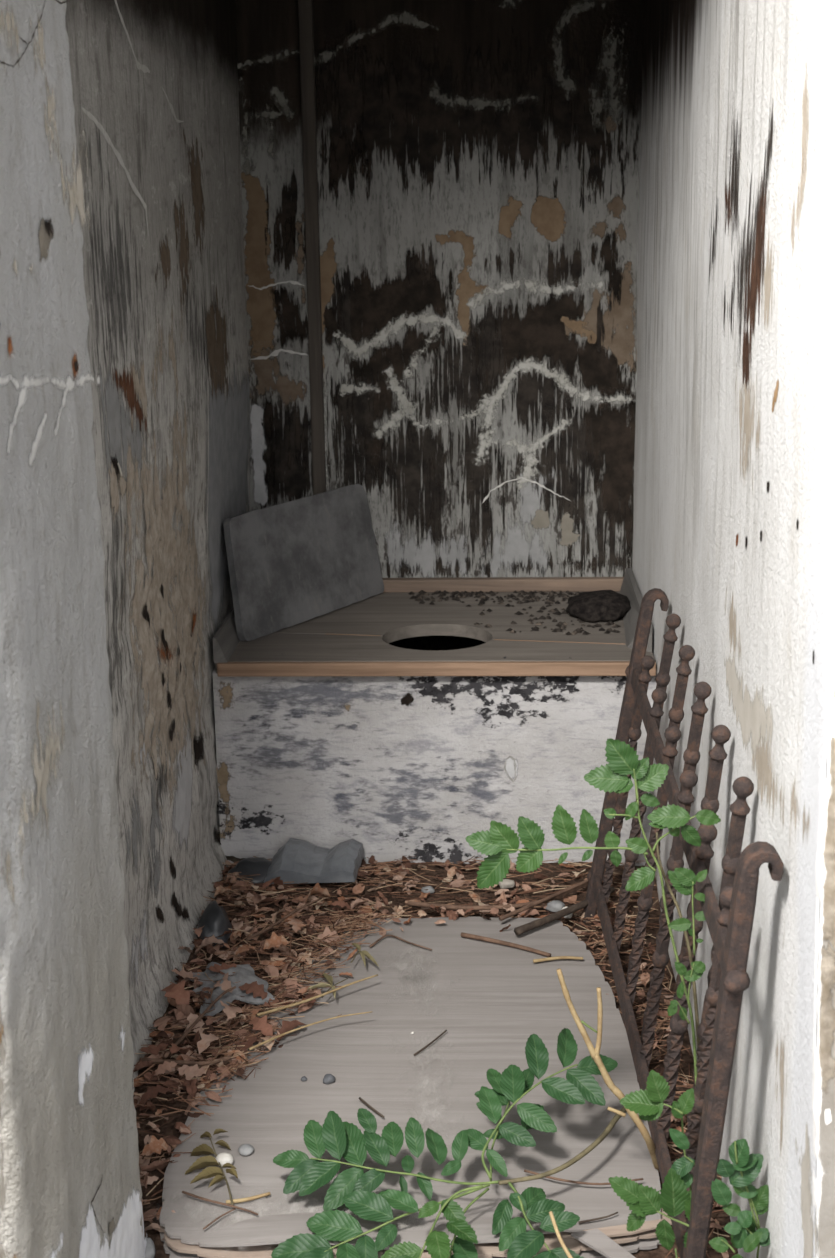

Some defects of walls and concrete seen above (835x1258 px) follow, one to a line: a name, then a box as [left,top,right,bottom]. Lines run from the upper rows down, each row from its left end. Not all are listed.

crack [0,0,70,67]
peeling [241,171,308,408]
peeling [320,238,337,385]
peeling [435,230,488,346]
peeling [498,195,566,242]
peeling [560,262,637,372]
water stain [708,91,741,339]
peeling [531,509,580,546]
water stain [216,676,580,839]
water stain [334,750,511,864]
peeling [724,656,809,836]
spalling [818,736,835,1258]